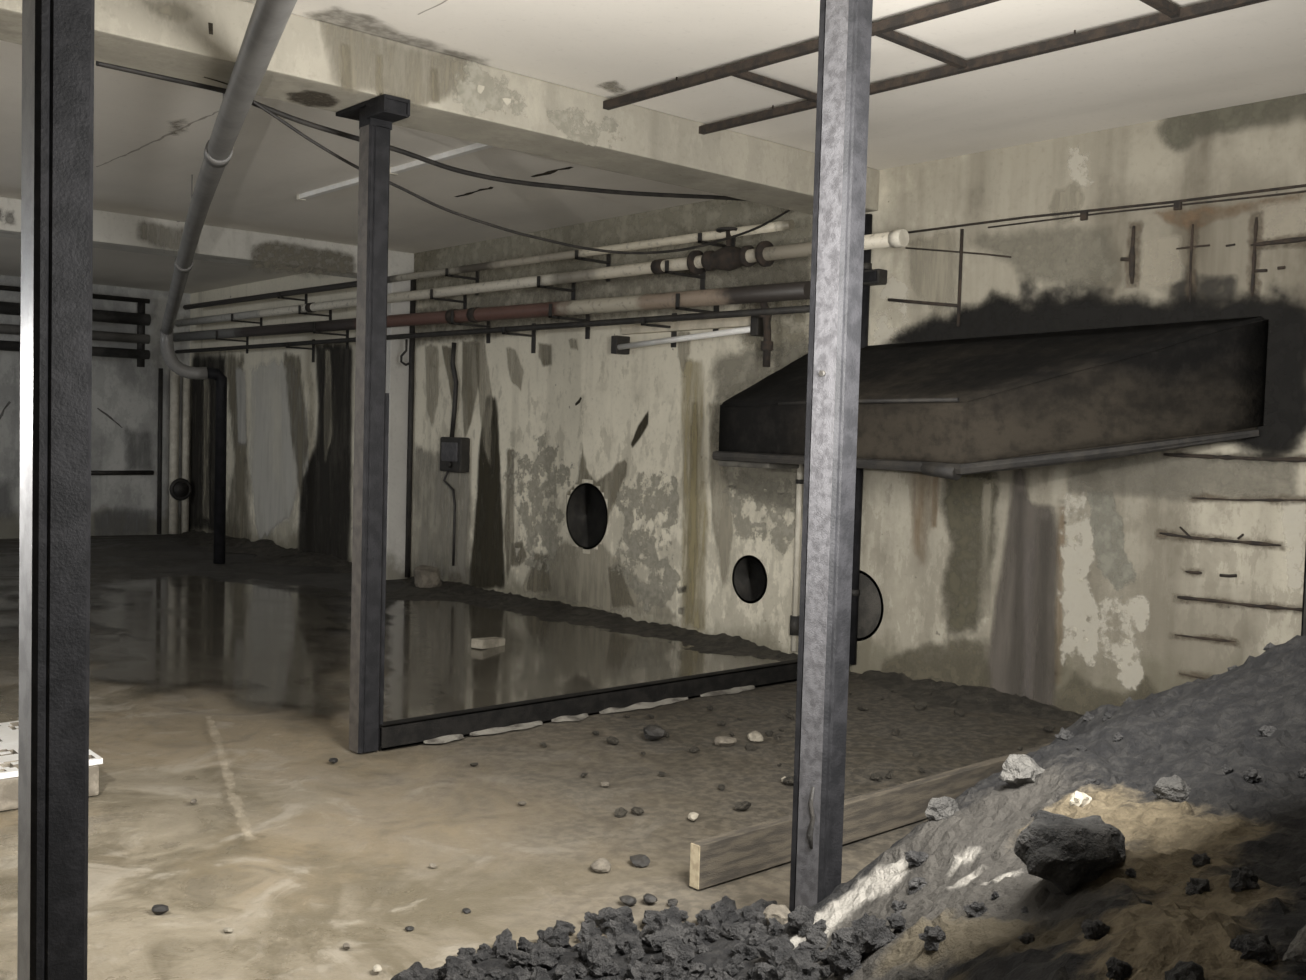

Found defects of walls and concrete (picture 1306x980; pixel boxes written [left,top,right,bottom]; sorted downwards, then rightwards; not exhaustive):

damp [315,11,470,106]
damp [1160,93,1306,149]
damp [284,344,352,561]
peeling [505,434,573,573]
peeling [611,471,686,611]
damp [882,469,1151,715]
peeling [1059,491,1149,690]